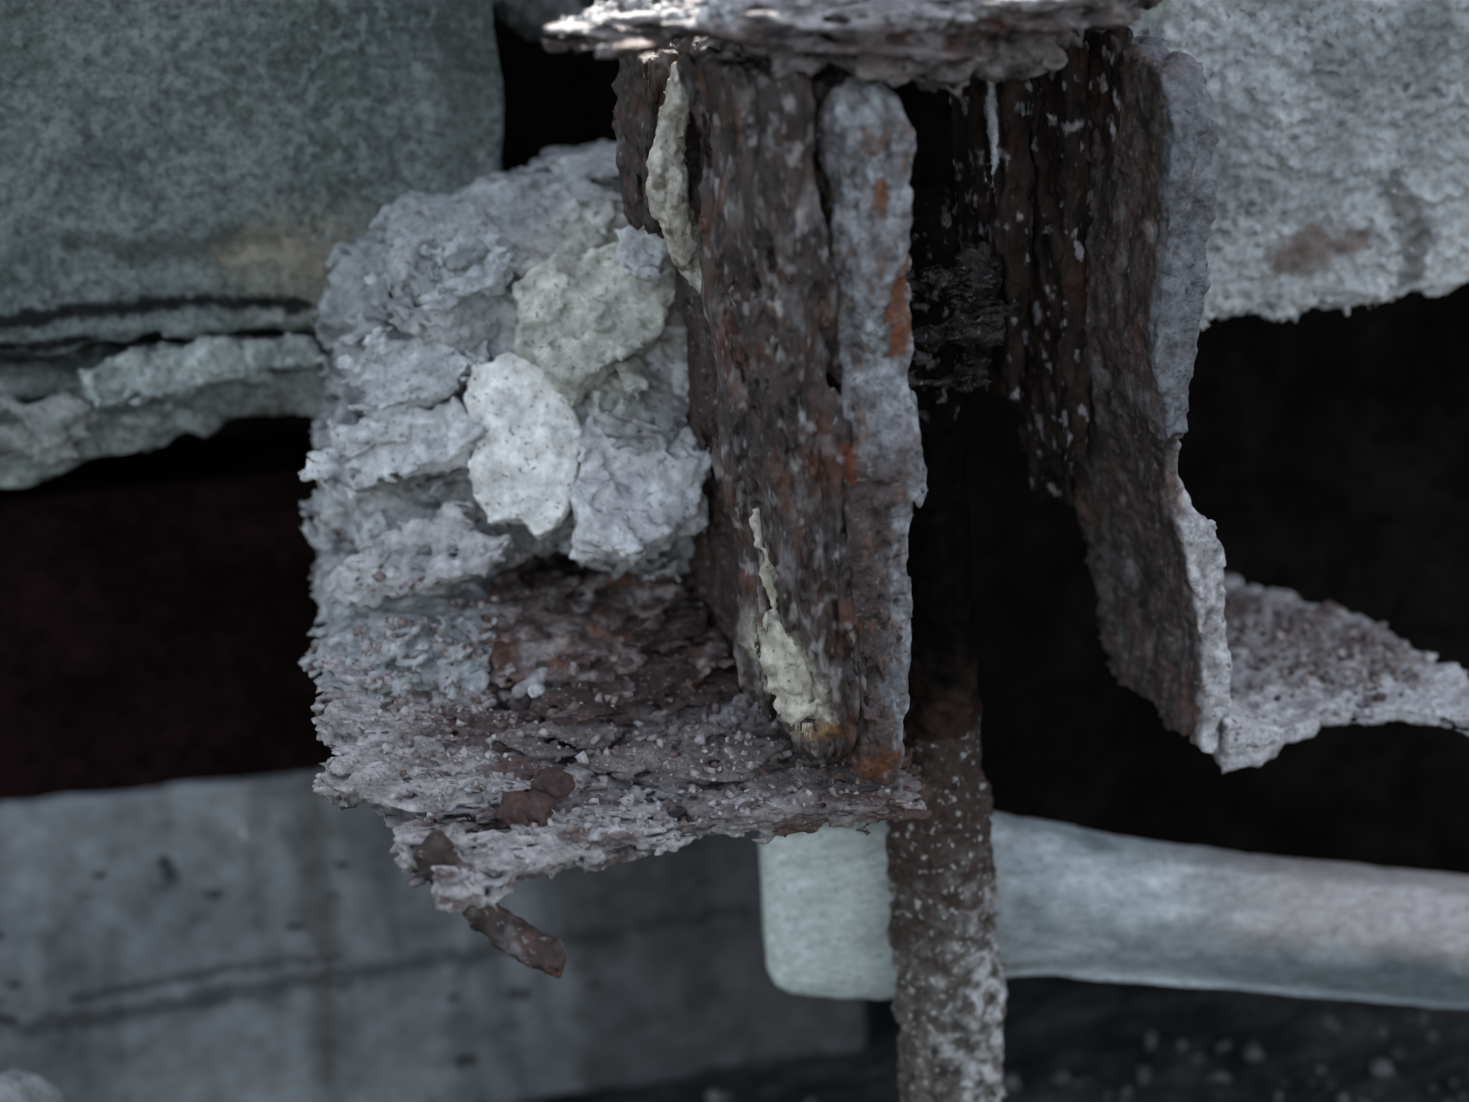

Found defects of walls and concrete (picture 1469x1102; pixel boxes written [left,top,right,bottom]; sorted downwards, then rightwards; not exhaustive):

spalling [0,139,712,609]
corrosion [612,46,867,765]
corrosion [874,177,888,215]
corrosion [887,255,911,355]
corrosion [949,27,1134,506]
leakage [743,508,830,739]
peeling [312,638,927,886]
peeling [461,903,567,978]